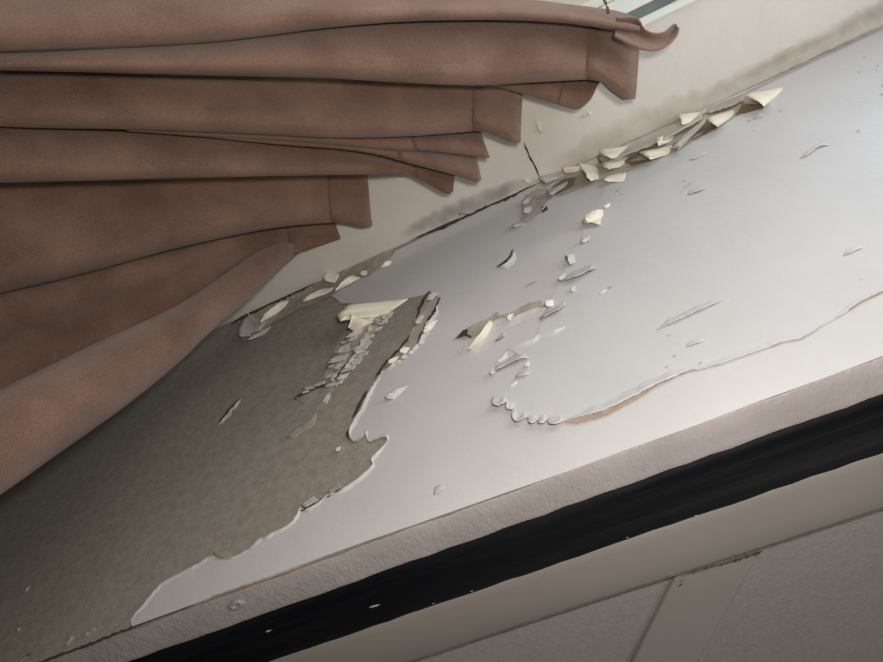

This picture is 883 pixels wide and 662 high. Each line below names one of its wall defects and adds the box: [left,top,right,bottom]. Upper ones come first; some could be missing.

peeling [511,87,783,227]
peeling [581,203,611,243]
peeling [231,248,395,343]
peeling [451,300,565,353]
peeling [558,253,597,291]
peeling [490,326,566,425]
peeling [131,291,441,624]